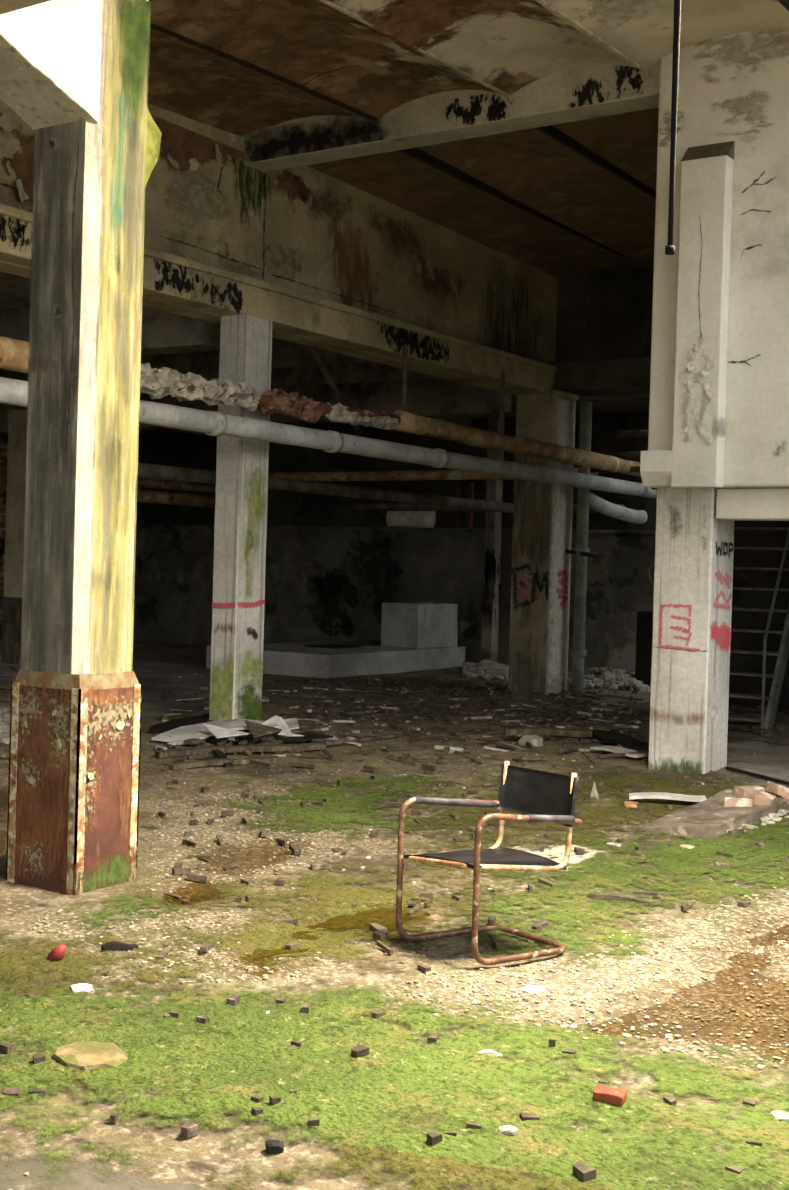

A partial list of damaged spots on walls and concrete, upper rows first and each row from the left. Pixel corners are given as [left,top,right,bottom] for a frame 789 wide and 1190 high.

flaking render [355,0,481,84]
flaking render [0,113,35,203]
damp [102,61,138,674]
peeling [680,336,715,446]
corrosion [12,684,80,878]